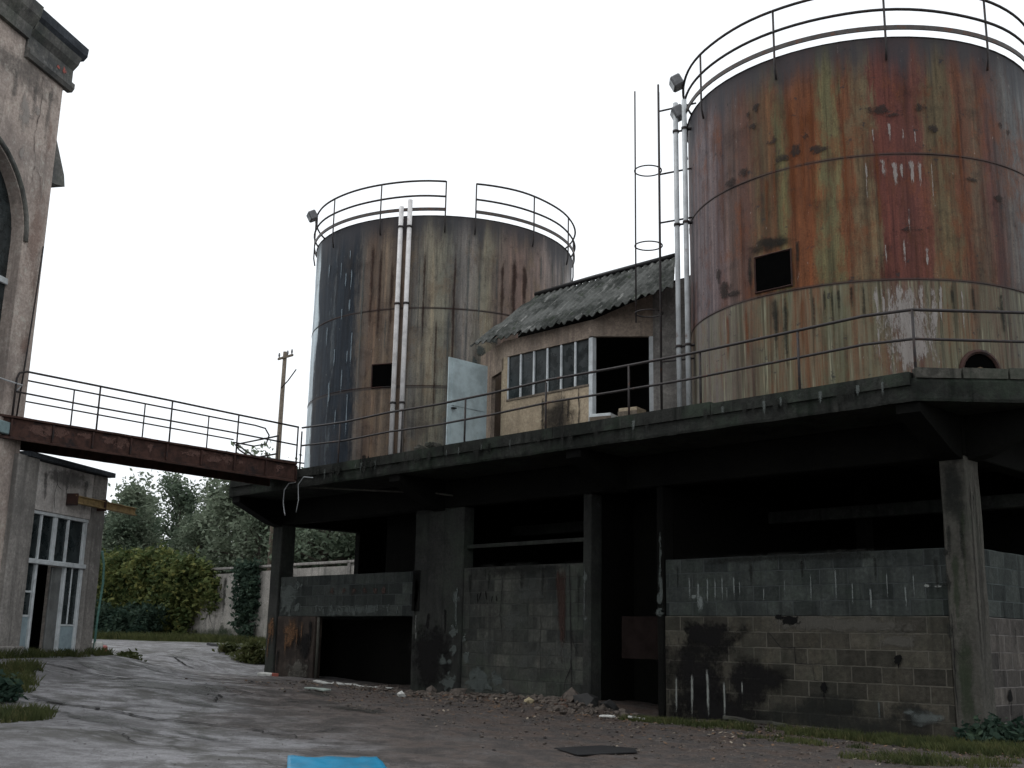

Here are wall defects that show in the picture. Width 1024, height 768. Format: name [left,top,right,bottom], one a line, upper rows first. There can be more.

rust [369,249,394,327]
rust [422,261,437,404]
rust [501,264,527,319]
peeling [873,285,942,371]
leakage [677,550,888,609]